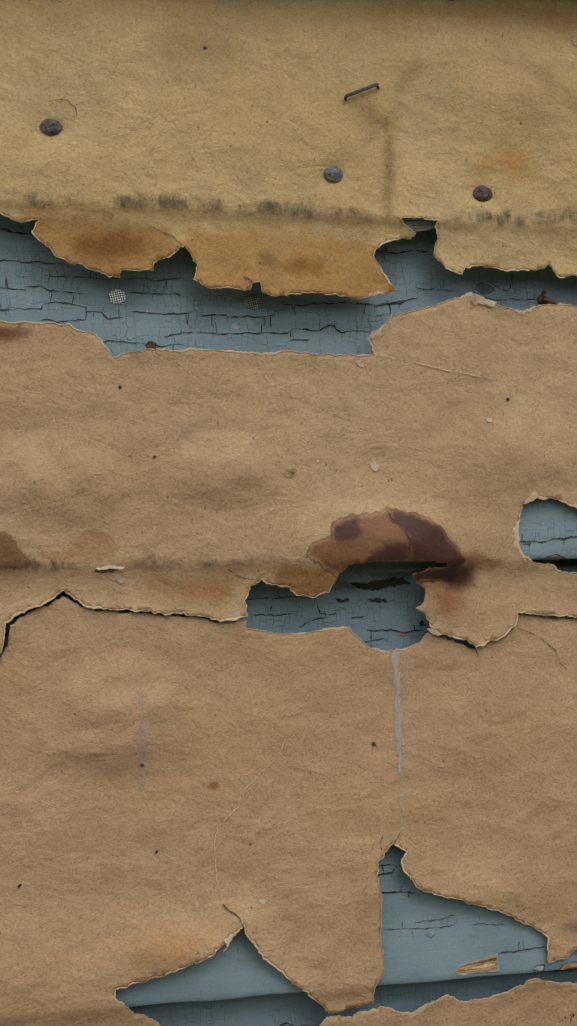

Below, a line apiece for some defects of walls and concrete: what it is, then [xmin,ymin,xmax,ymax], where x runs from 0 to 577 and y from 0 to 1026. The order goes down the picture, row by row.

crack [0,226,30,235]
peeling [404,220,435,231]
crack [376,247,428,260]
crack [0,259,456,350]
peeling [470,281,497,307]
peeling [532,554,566,564]
peeling [338,563,432,603]
water stain [391,651,402,774]
peeling [454,953,499,976]
peeling [533,961,577,972]